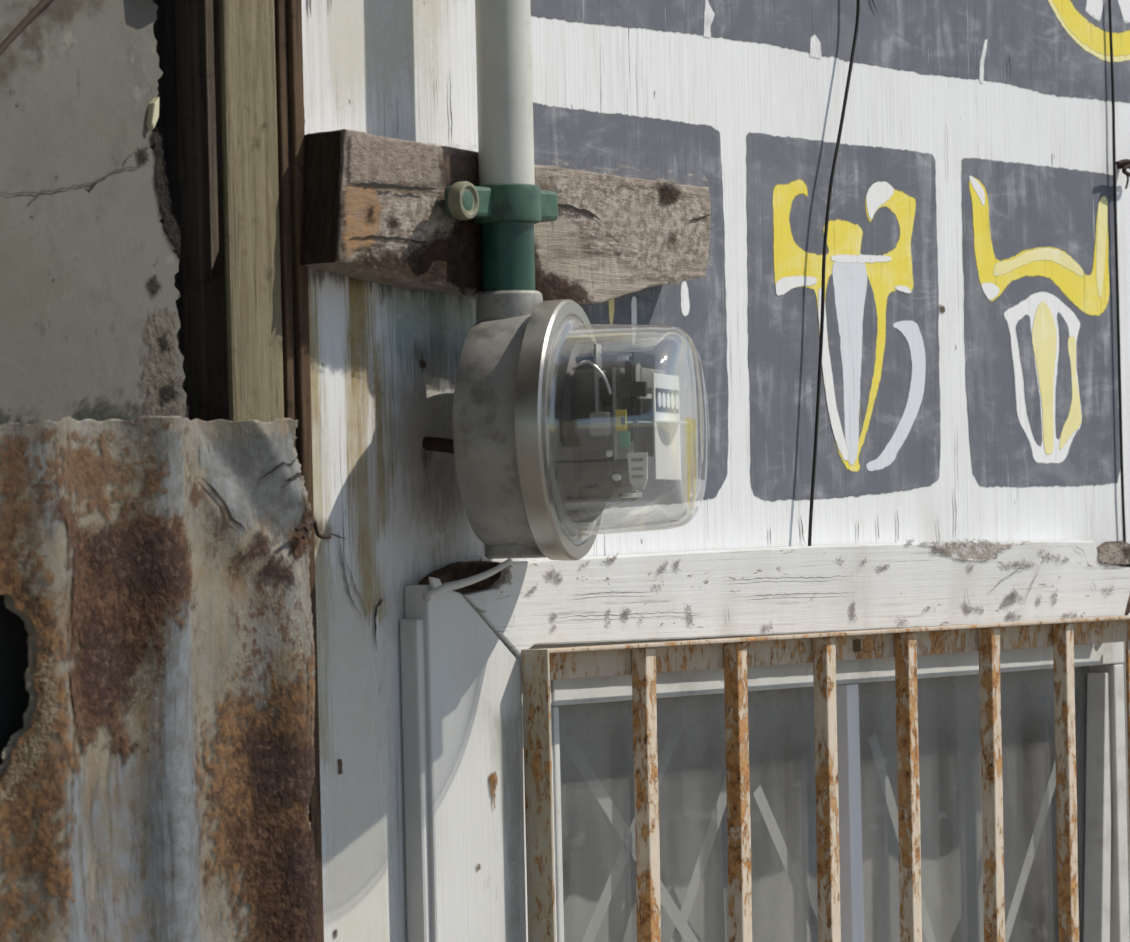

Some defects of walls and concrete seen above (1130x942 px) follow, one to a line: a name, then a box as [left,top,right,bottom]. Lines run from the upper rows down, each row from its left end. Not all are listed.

crack [2,152,147,204]
spalling [137,97,181,257]
spalling [148,275,161,295]
spalling [140,307,188,417]
corrosion [232,494,323,586]
peeling [906,539,1069,571]
peeling [1099,540,1130,566]
peeling [999,589,1023,621]
corrosion [0,428,198,942]
corrosion [193,638,317,942]
corrosion [489,772,497,809]